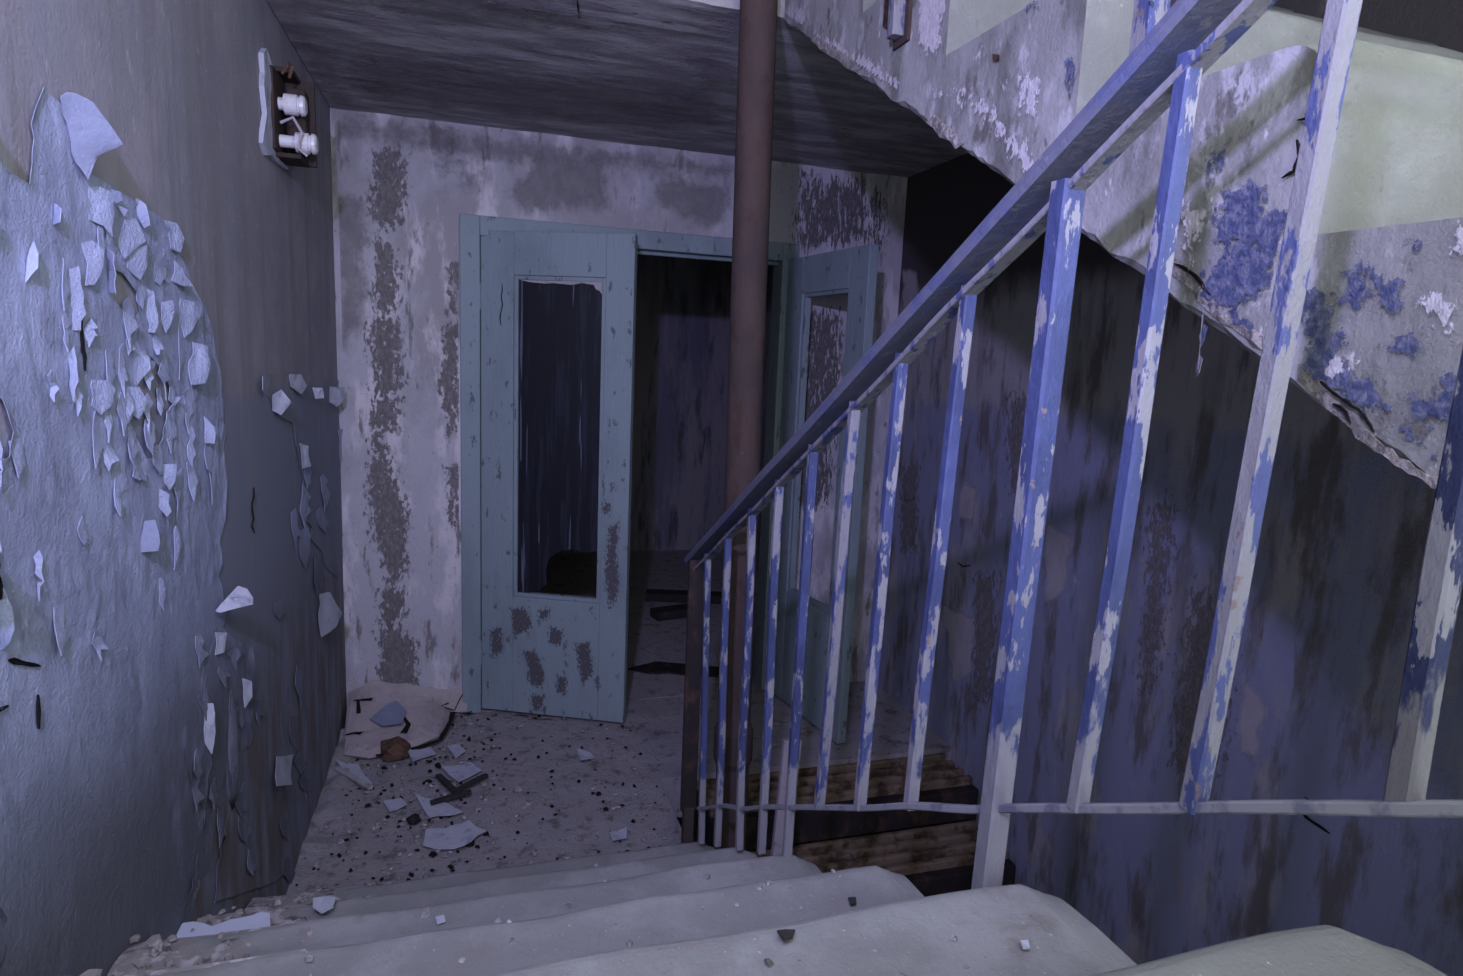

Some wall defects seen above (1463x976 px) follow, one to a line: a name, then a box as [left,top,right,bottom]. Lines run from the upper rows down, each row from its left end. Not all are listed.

peeling [0,88,312,976]
peeling [262,372,344,637]
leakage [339,143,422,686]
leakage [437,261,459,437]
leakage [442,462,459,528]
leakage [514,158,605,209]
leakage [658,181,727,224]
spalling [811,35,861,71]
spalling [926,114,965,149]
peeling [1064,57,1075,99]
peeling [1172,178,1287,377]
peeling [1297,260,1457,489]